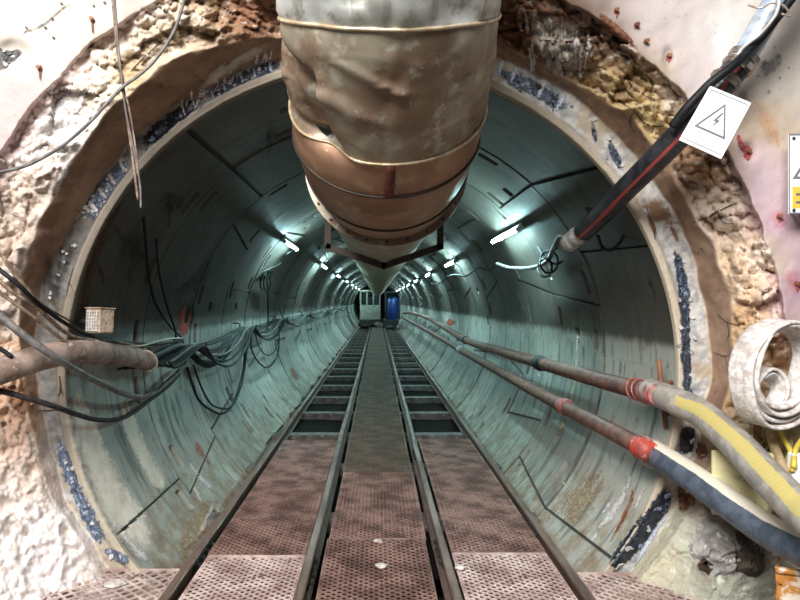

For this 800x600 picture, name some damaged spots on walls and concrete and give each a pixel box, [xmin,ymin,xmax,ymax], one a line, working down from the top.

spalling [0,48,21,69]
peeling [497,60,574,112]
spalling [600,14,637,47]
peeling [143,90,202,151]
peeling [605,138,624,168]
rust [737,135,753,160]
peeling [82,158,128,219]
peeling [48,243,77,299]
peeling [673,250,697,393]
peeling [57,441,129,564]
damp [588,475,631,546]
rust [611,489,634,540]